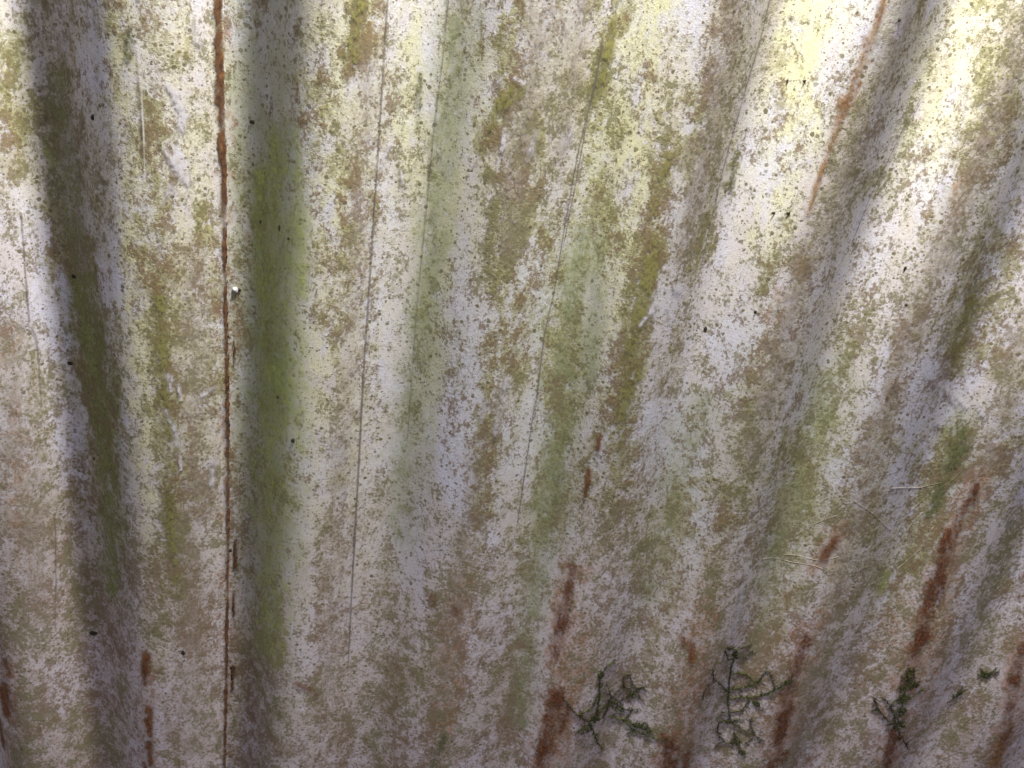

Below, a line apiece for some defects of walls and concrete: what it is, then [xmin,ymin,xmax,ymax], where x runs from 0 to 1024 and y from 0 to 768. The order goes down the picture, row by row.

corrosion [835,0,886,132]
corrosion [809,151,829,209]
corrosion [214,0,238,768]
corrosion [553,563,577,658]
corrosion [900,483,980,690]
corrosion [141,650,150,686]
corrosion [142,706,154,768]
corrosion [534,687,583,768]